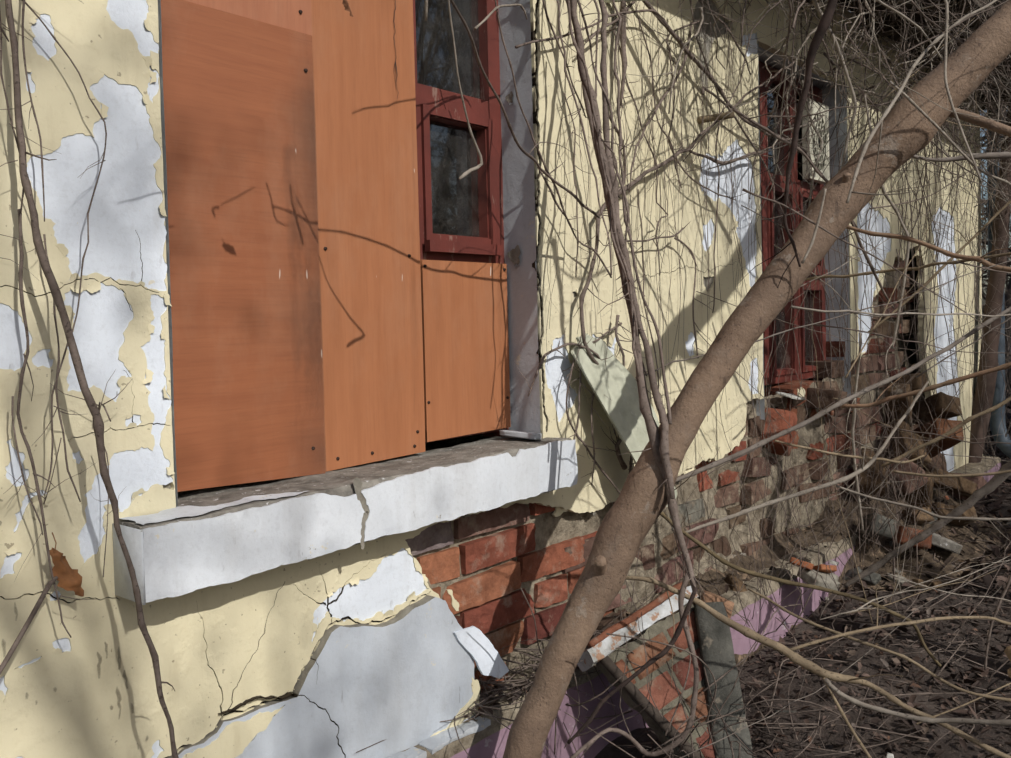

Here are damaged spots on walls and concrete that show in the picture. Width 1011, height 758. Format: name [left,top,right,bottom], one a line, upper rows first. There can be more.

peeling [0,303,53,371]
peeling [27,0,175,563]
peeling [699,139,757,287]
peeling [931,207,960,397]
peeling [0,547,21,579]
peeling [5,439,47,532]
crack [0,591,118,603]
crack [210,573,426,754]
crack [353,477,370,549]
spalling [312,502,615,692]
spalling [591,203,923,639]
peeling [941,447,956,472]